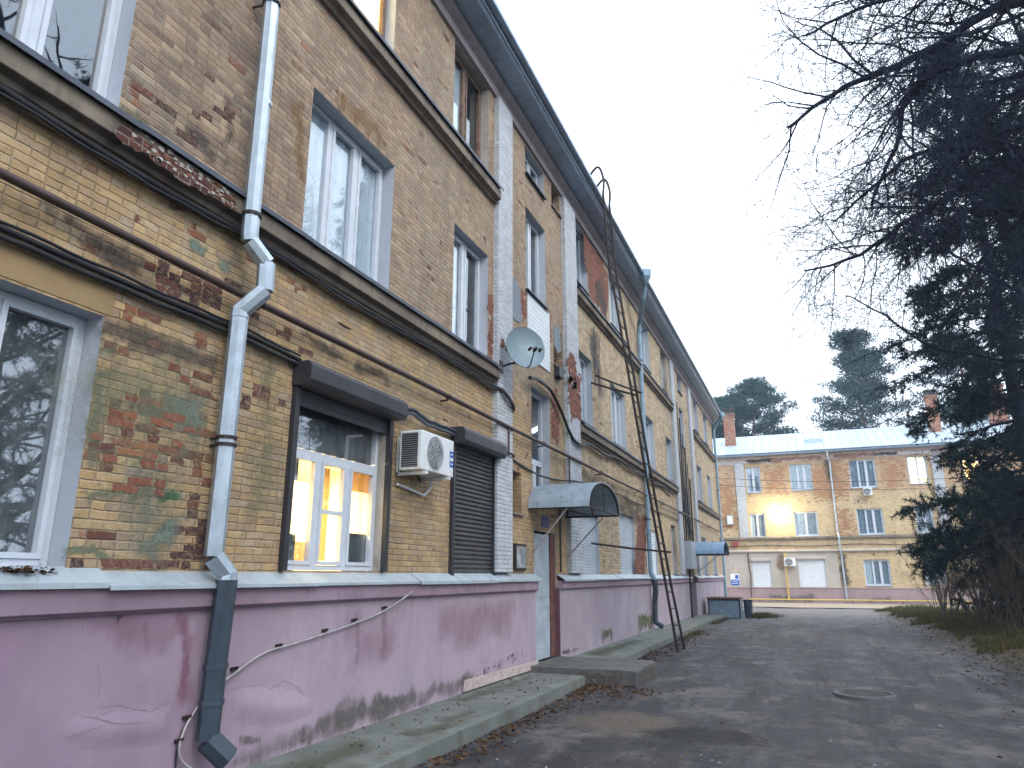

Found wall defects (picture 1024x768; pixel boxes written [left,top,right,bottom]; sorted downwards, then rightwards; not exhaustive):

peeling [131,78,235,147]
flaking render [114,125,237,211]
peeling [583,232,609,318]
flaking render [551,353,583,445]
water stain [301,675,471,741]